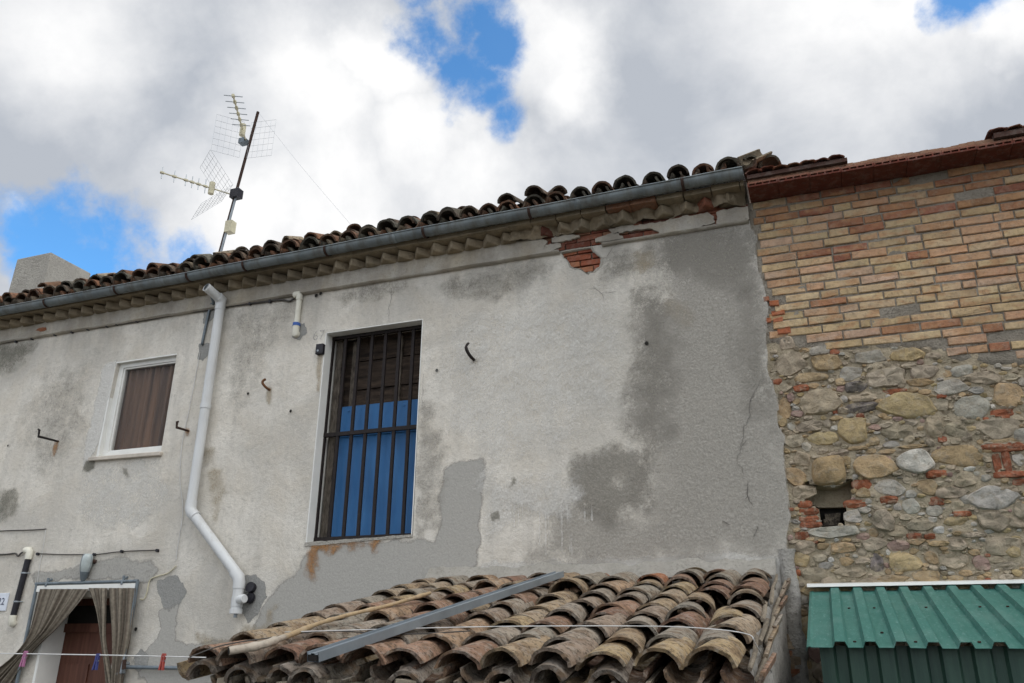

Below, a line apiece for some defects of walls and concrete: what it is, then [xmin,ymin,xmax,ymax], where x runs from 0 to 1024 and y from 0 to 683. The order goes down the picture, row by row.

flaking render [540,196,750,274]
damp [482,229,791,565]
crack [737,378,765,539]
rust [307,542,355,574]